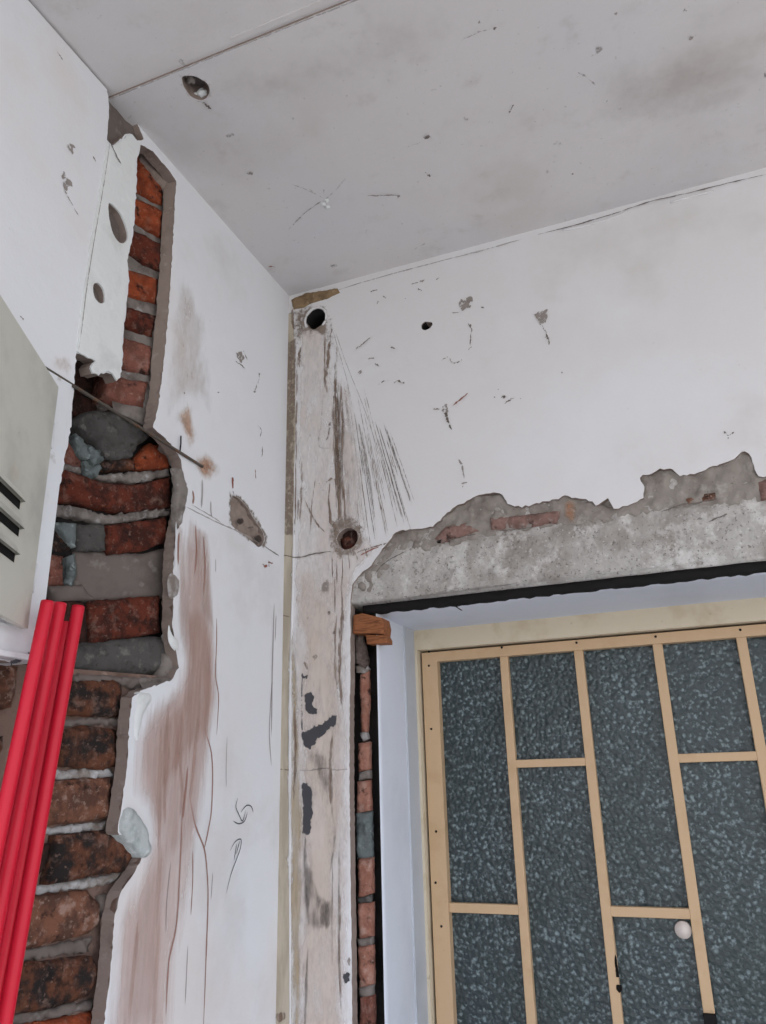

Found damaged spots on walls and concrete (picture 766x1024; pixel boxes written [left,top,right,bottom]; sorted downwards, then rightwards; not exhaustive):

flaking render [107,102,137,144]
peeling [453,296,484,313]
peeling [534,309,550,344]
spalling [13,154,188,1024]
spalling [229,477,267,547]
water stain [334,335,412,556]
spalling [358,453,766,592]
flaking render [0,664,27,790]
flaking render [263,313,337,1024]
water stain [120,619,219,1024]